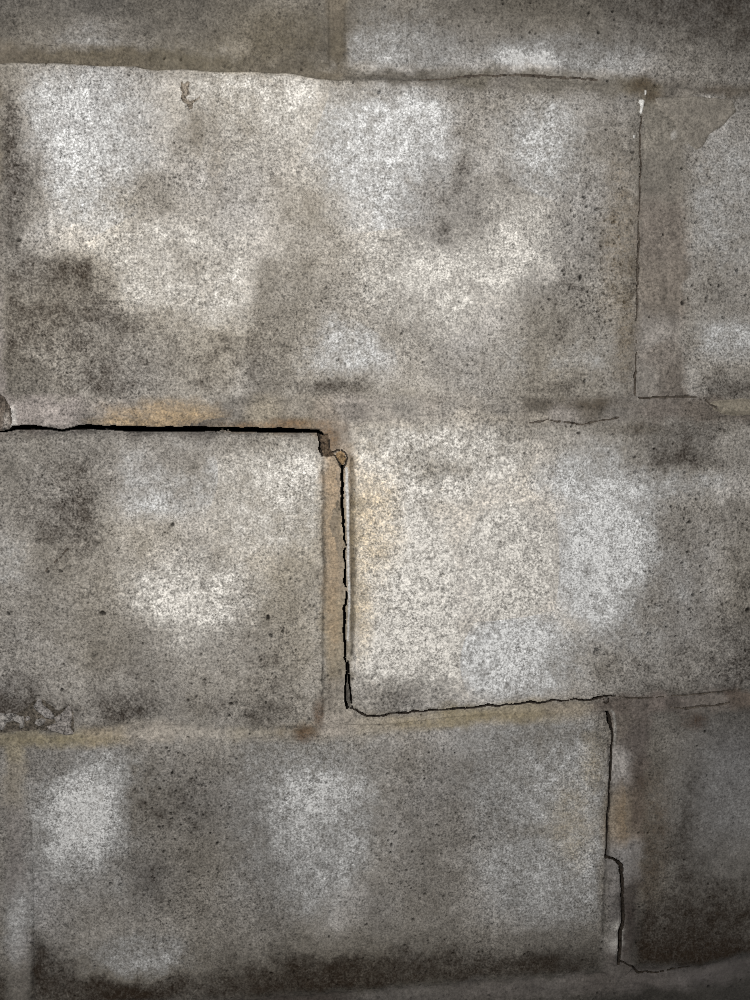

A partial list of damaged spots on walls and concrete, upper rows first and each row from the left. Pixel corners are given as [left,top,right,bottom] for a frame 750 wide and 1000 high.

spalling [180,81,200,110]
crack [633,116,717,409]
crack [529,417,619,425]
peeling [0,699,75,735]
crack [0,424,742,974]